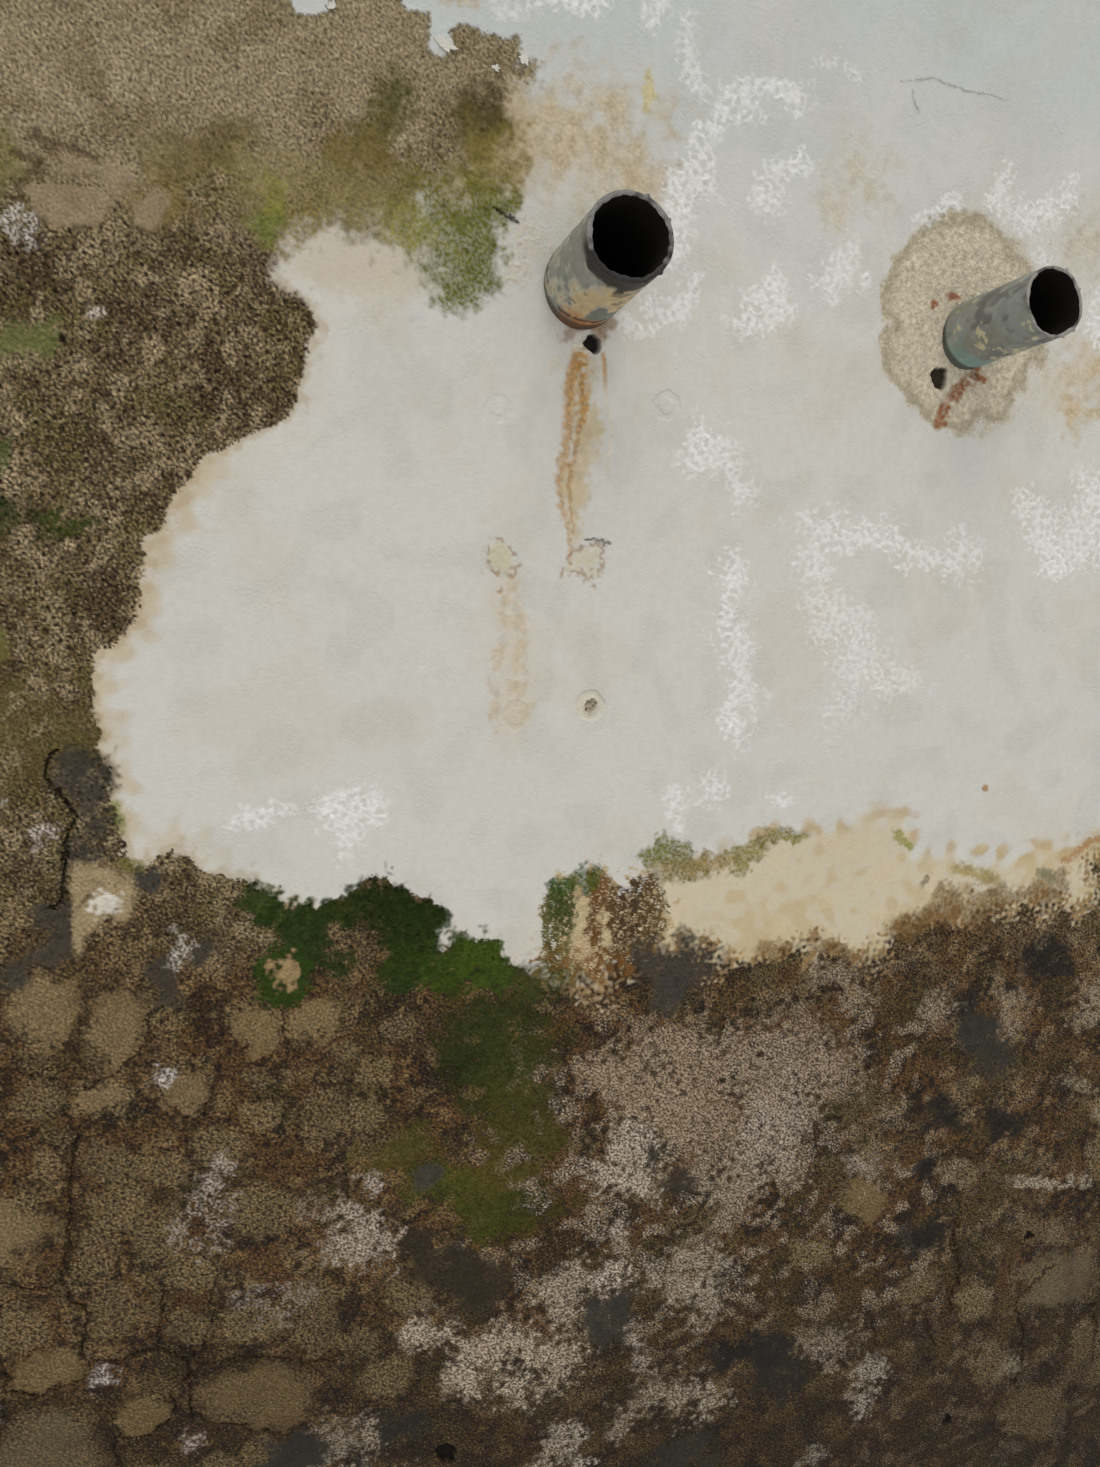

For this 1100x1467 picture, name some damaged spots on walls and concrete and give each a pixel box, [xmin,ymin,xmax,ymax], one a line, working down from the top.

leakage [438,0,616,24]
peeling [0,0,537,719]
rust [555,316,619,545]
leakage [495,0,1100,443]
rust [931,292,961,310]
rust [934,367,988,431]
peeling [878,209,1049,439]
leakage [528,806,1100,1019]
crack [0,1017,155,1091]
crack [164,1071,218,1123]
peeling [0,744,1100,1467]
crack [0,1129,349,1467]